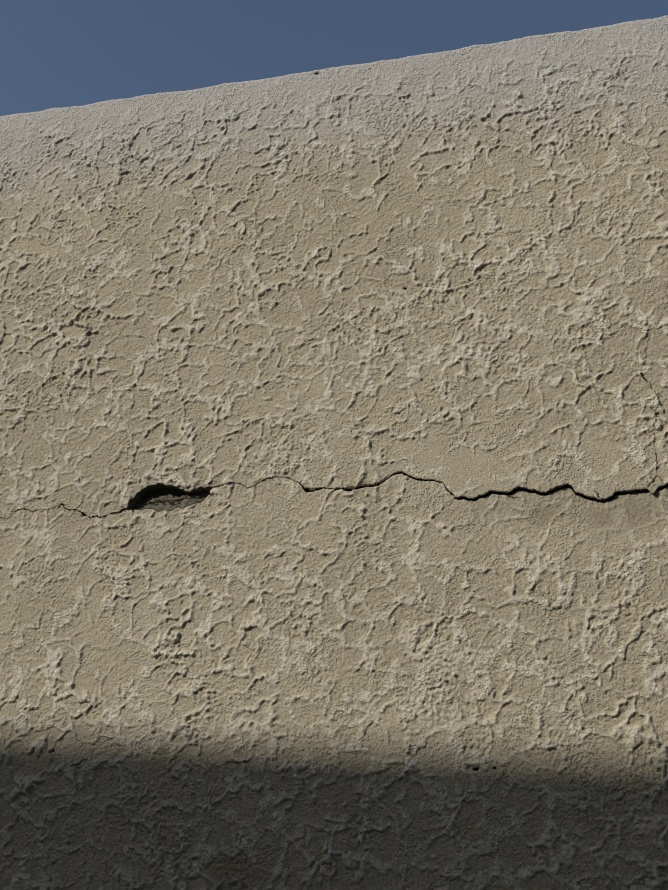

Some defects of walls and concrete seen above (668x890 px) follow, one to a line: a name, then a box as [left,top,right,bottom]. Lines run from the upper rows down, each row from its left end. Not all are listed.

spalling [127,483,213,511]
crack [214,286,668,502]